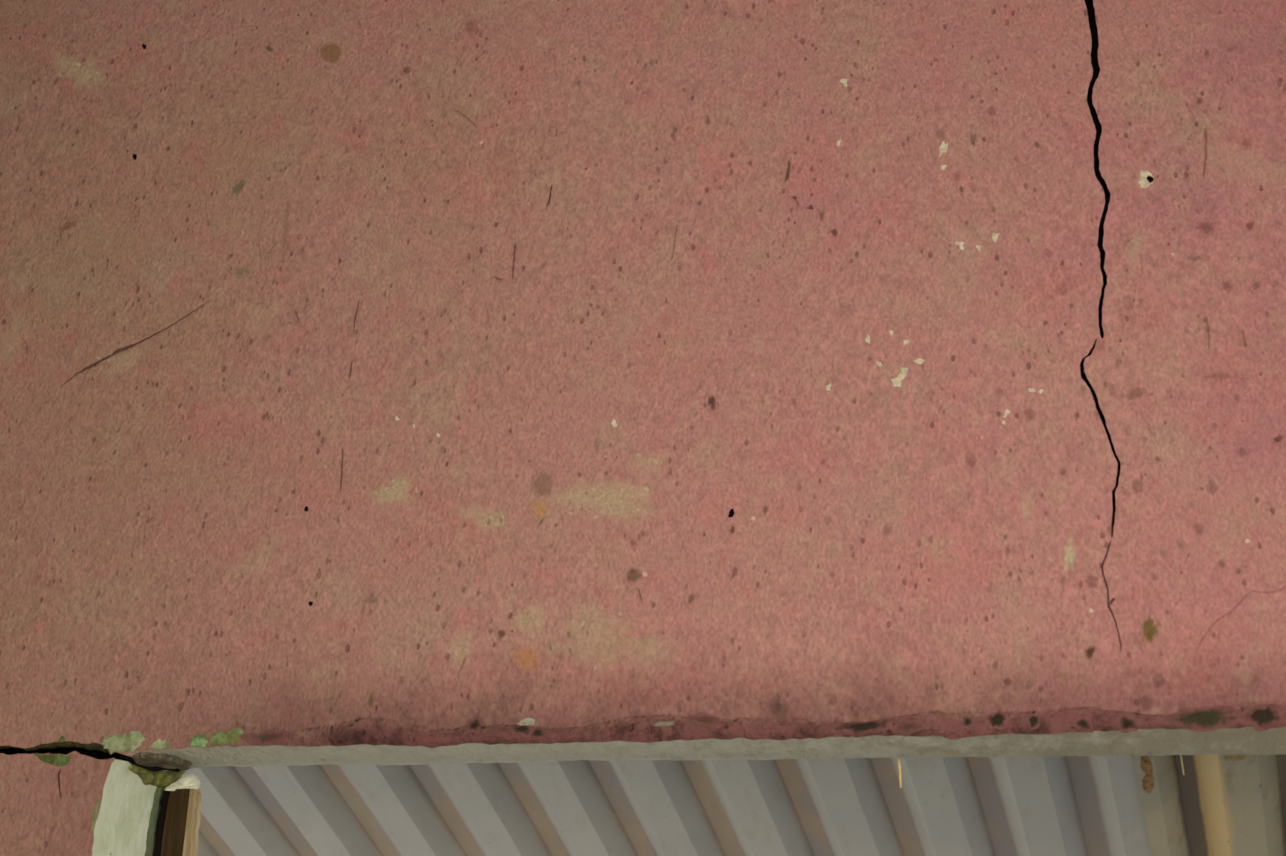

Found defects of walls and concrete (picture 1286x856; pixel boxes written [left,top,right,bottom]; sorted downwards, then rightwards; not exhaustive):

crack [1080,0,1122,654]
crack [0,735,180,800]